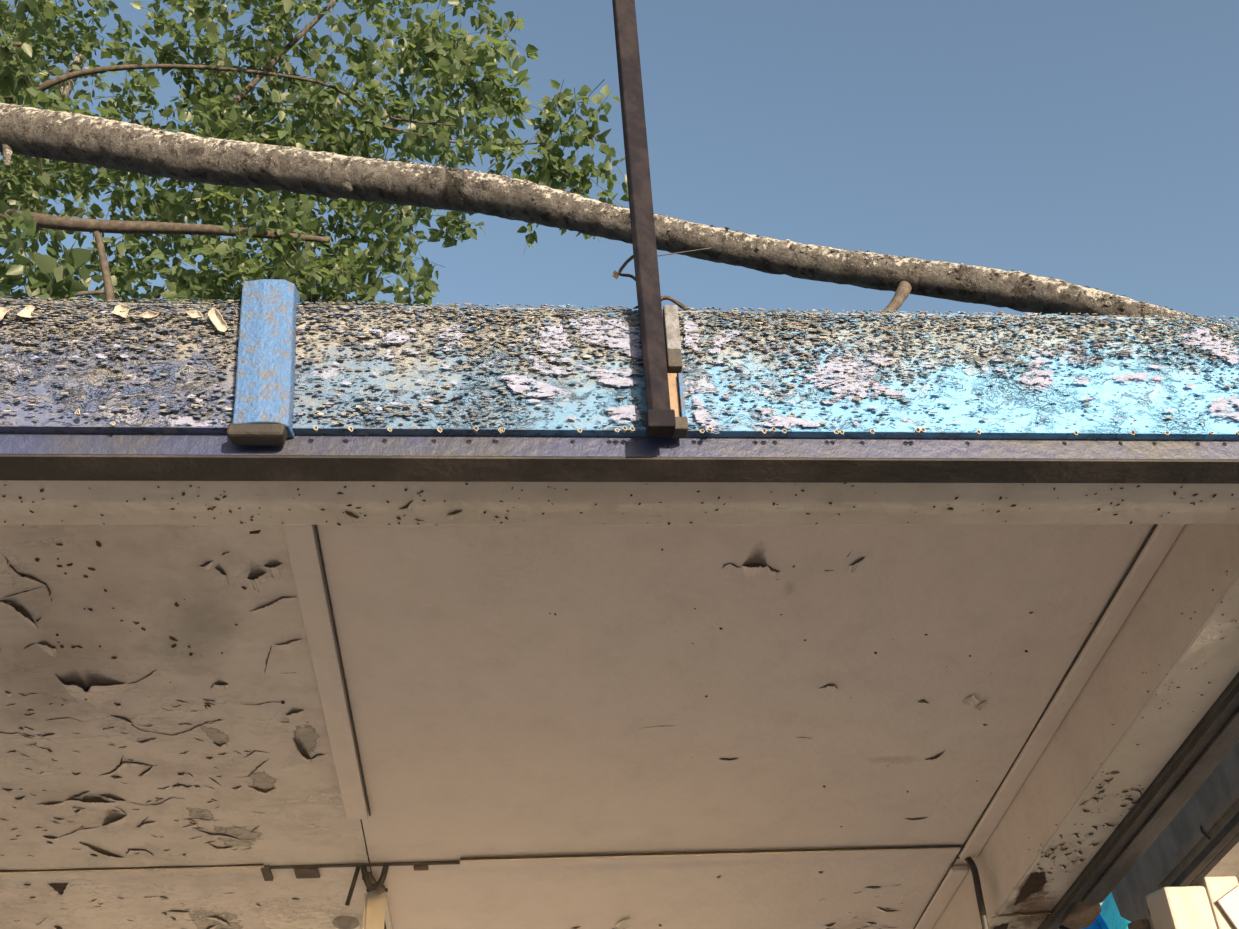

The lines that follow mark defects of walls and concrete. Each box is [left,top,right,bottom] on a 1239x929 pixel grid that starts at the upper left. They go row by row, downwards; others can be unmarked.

peeling [0,305,40,321]
peeling [111,304,159,319]
peeling [186,308,227,342]
peeling [363,328,419,362]
peeling [436,325,466,384]
peeling [479,314,642,433]
peeling [690,388,721,434]
peeling [683,315,749,363]
peeling [752,348,909,435]
peeling [968,338,1078,392]
peeling [1169,326,1239,365]
peeling [40,791,261,851]